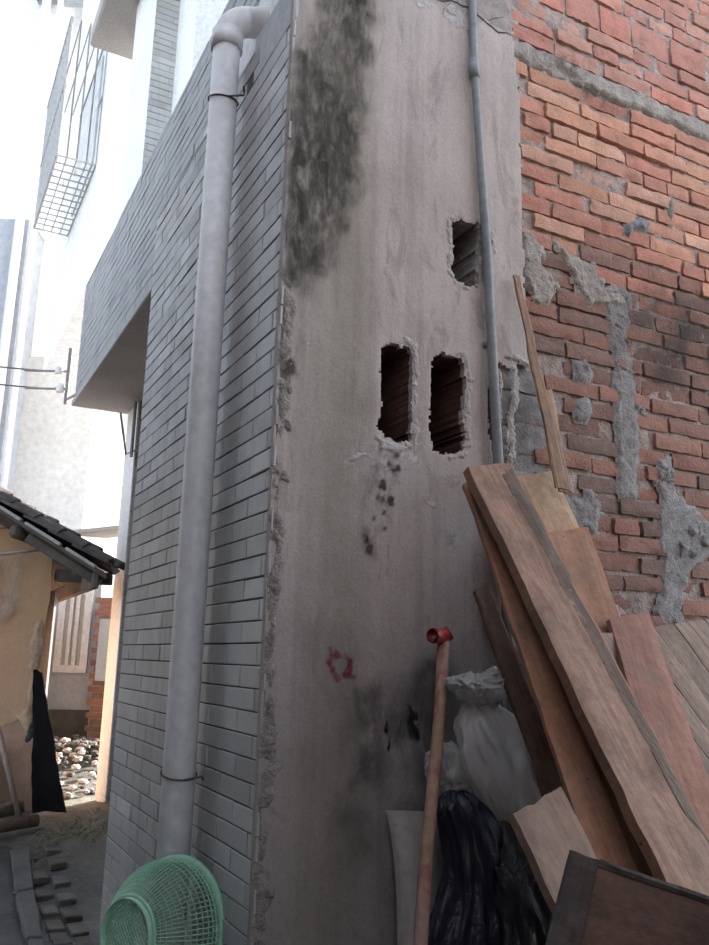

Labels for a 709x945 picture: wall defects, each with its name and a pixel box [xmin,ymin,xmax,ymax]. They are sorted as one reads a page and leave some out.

crack [440,0,514,35]
leakage [291,0,372,279]
spalling [446,213,498,291]
spalling [274,268,298,445]
peeling [679,524,709,559]
spalling [257,458,290,811]